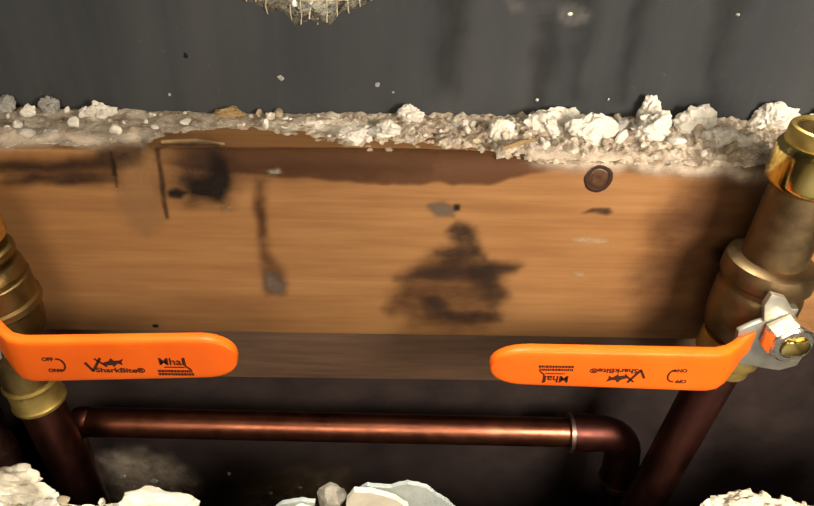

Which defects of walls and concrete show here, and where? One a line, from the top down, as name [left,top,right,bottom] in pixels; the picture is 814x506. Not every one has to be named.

spalling [246,0,372,25]
leakage [168,152,230,200]
leakage [430,204,460,216]
leakage [395,225,515,323]
spalling [0,377,679,506]
spalling [665,343,814,506]